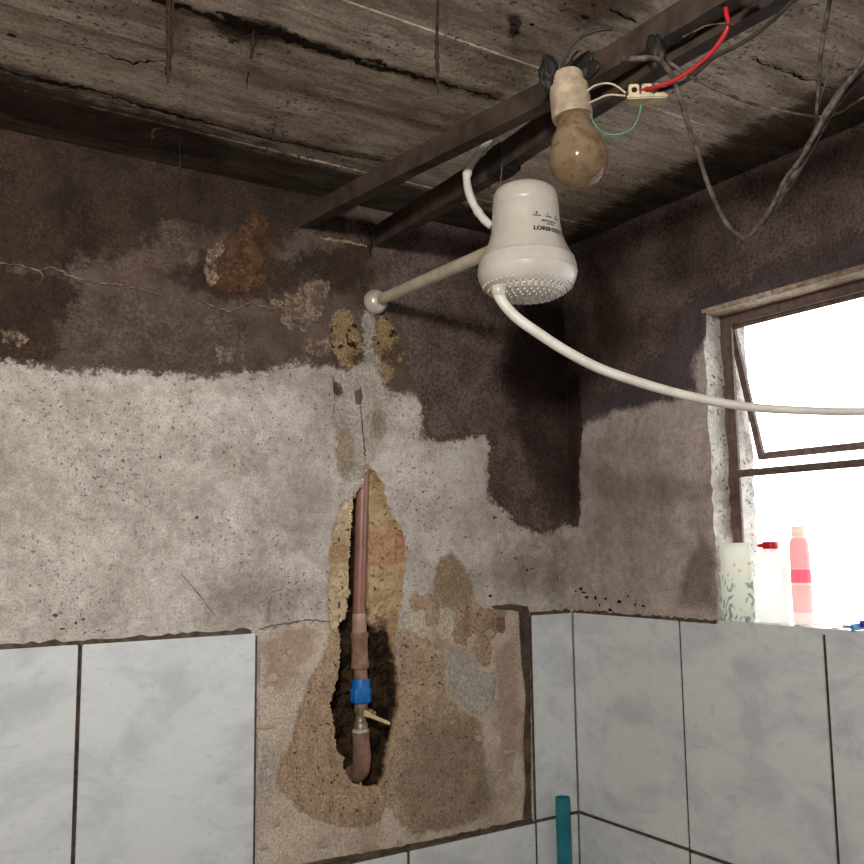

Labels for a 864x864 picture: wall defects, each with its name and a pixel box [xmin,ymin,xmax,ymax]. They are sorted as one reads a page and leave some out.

crack [97,52,167,65]
crack [151,0,504,101]
crack [608,9,637,23]
crack [0,64,388,162]
crack [0,262,162,296]
rust [204,211,276,306]
spalling [320,237,367,247]
flaking render [268,280,363,370]
flaking render [374,316,405,387]
water stain [500,295,583,527]
peeling [256,453,532,864]